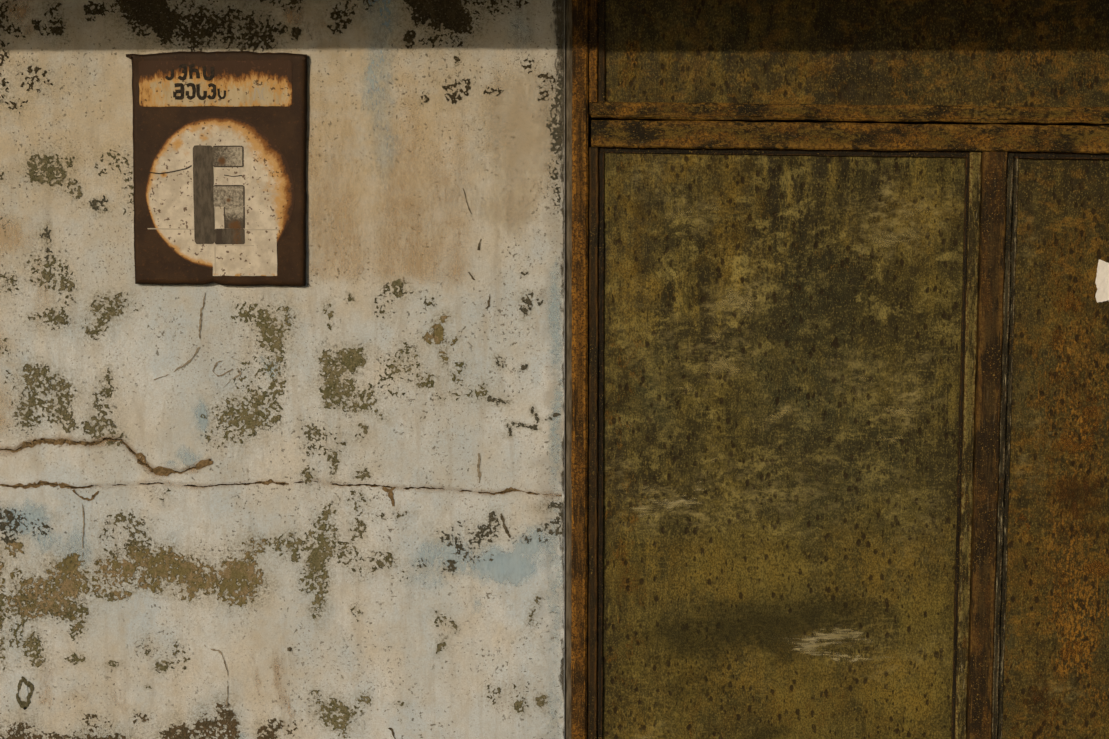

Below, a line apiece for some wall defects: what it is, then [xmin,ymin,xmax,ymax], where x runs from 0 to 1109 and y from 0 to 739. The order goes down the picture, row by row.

peeling [84,0,186,45]
peeling [403,0,529,49]
flaking render [422,314,458,364]
crack [0,437,562,559]
peeling [0,537,268,636]
peeling [0,676,126,739]